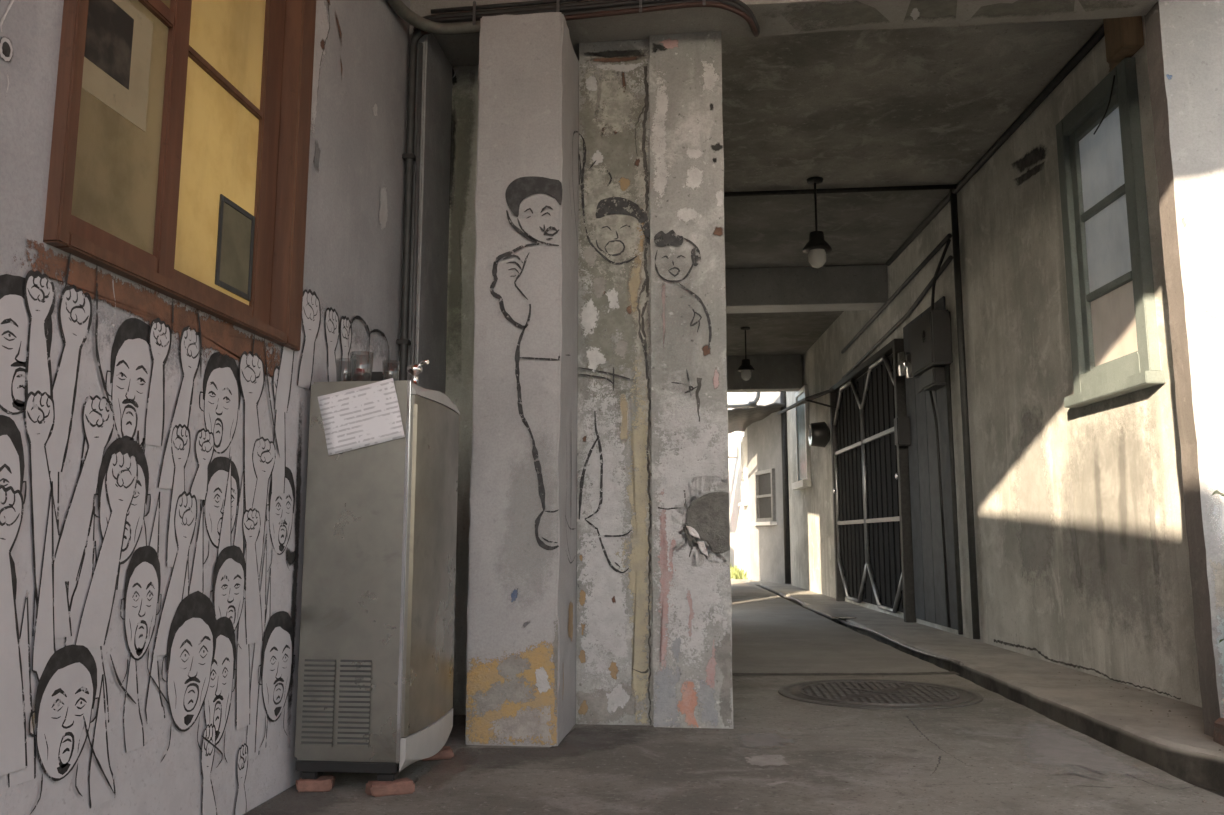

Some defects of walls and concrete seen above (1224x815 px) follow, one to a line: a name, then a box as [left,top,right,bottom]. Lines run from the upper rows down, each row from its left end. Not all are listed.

peeling [466,38,733,746]